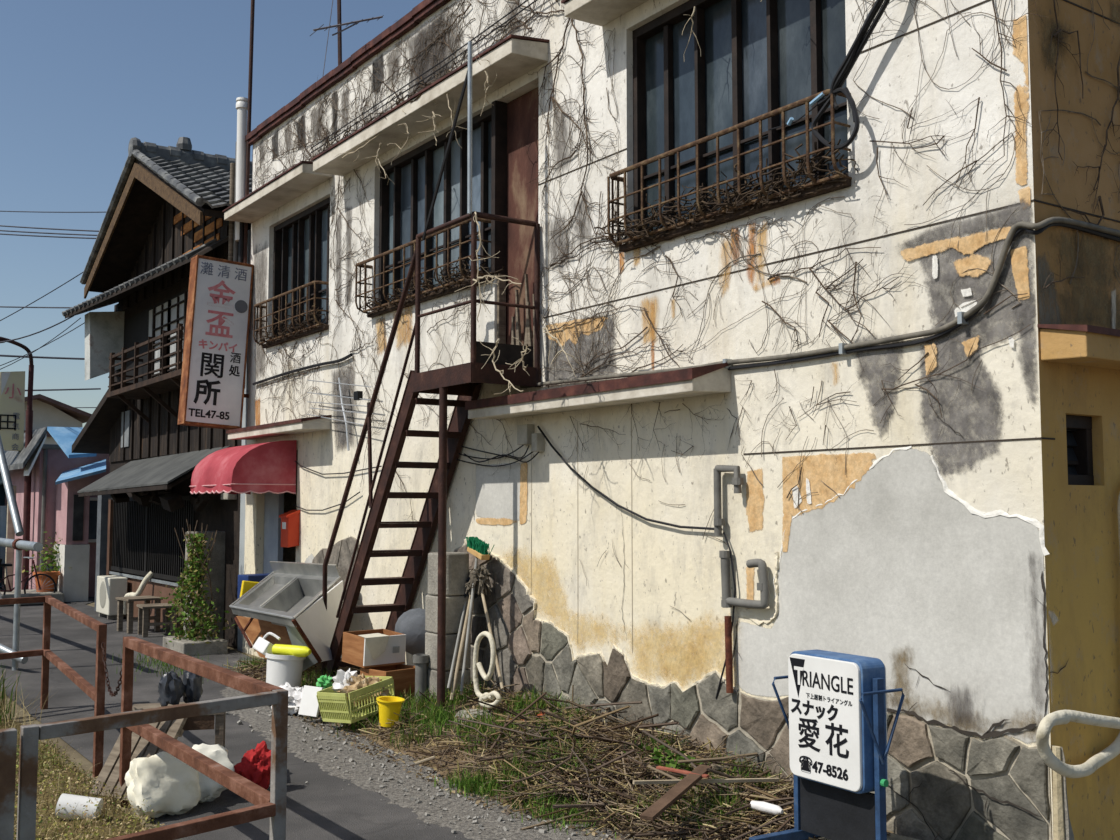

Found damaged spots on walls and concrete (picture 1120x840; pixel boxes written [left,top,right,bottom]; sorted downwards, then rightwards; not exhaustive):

peeling [1012,15,1031,205]
corrosion [721,223,779,292]
peeling [901,227,1030,317]
damp [856,335,904,435]
peeling [924,343,937,376]
peeling [962,335,979,357]
damp [902,200,1120,474]
damp [507,554,726,685]
peeling [533,446,1057,744]
spalling [1052,745,1074,840]